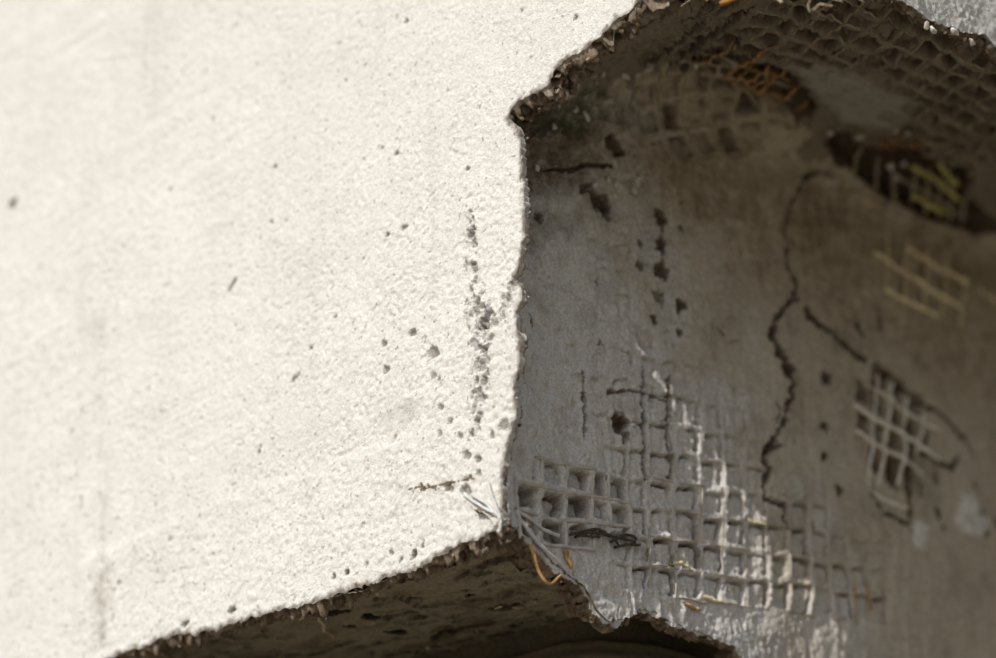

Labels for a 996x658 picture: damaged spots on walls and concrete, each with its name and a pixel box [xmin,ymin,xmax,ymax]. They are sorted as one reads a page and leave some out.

spalling [633,0,996,235]
spalling [115,0,890,658]
crack [760,170,977,532]
spalling [848,348,944,510]
spalling [912,519,929,549]
spalling [870,229,975,342]
spalling [955,483,996,537]